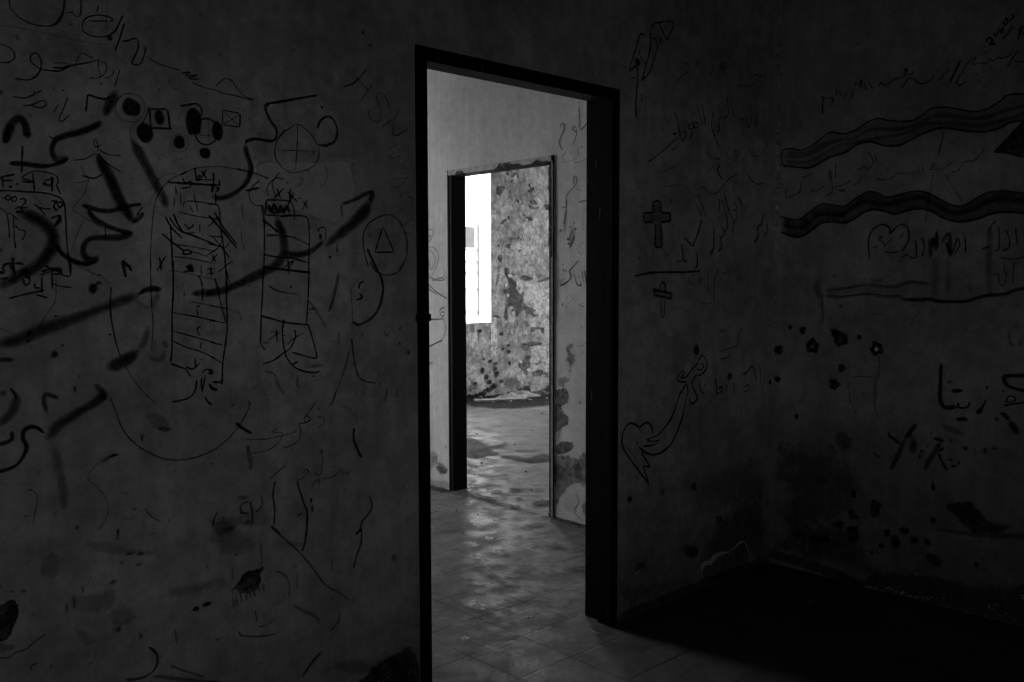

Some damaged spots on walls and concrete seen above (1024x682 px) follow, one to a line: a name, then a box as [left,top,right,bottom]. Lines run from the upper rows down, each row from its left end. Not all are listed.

damp [467,316,564,408]
peeling [555,388,574,454]